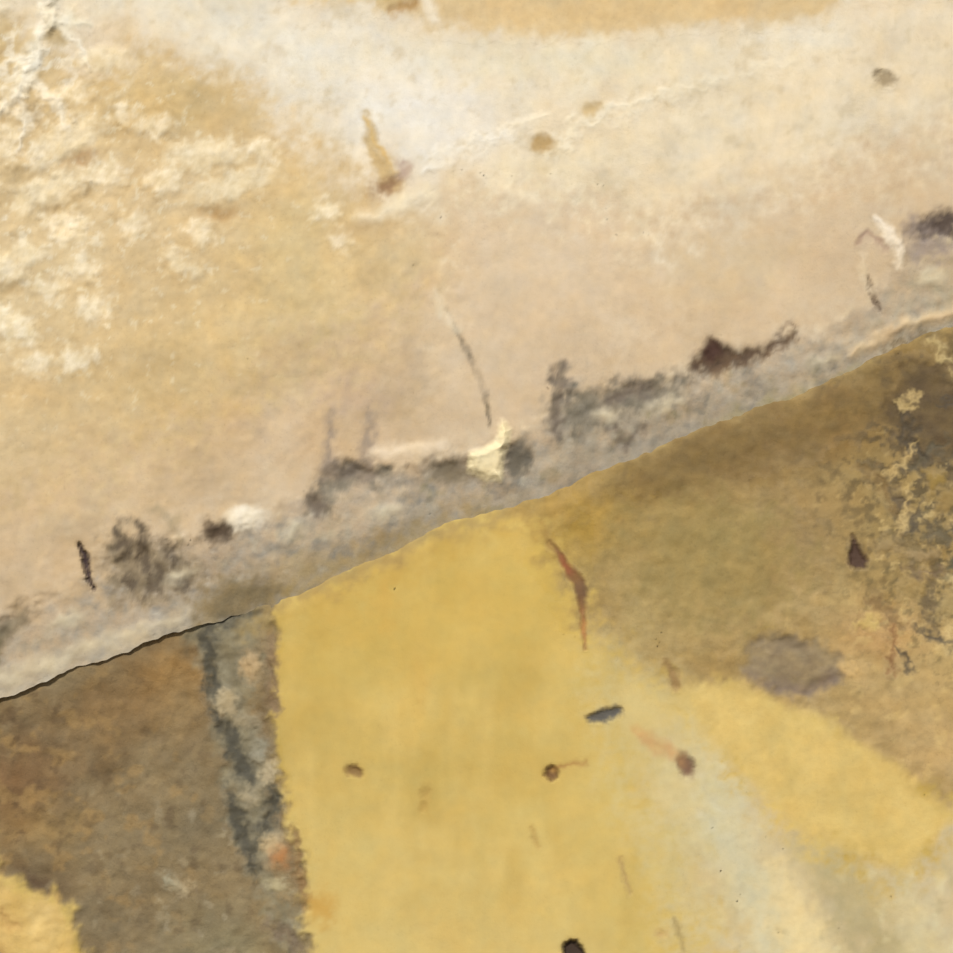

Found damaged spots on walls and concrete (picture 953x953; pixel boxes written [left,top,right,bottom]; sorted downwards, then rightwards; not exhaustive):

damp [0,77,953,662]
peeling [582,395,626,432]
peeling [158,562,205,591]
peeling [216,500,317,549]
peeling [356,496,413,529]
peeling [523,470,621,638]
damp [547,355,953,953]
peeling [631,327,953,800]
peeling [0,617,324,953]